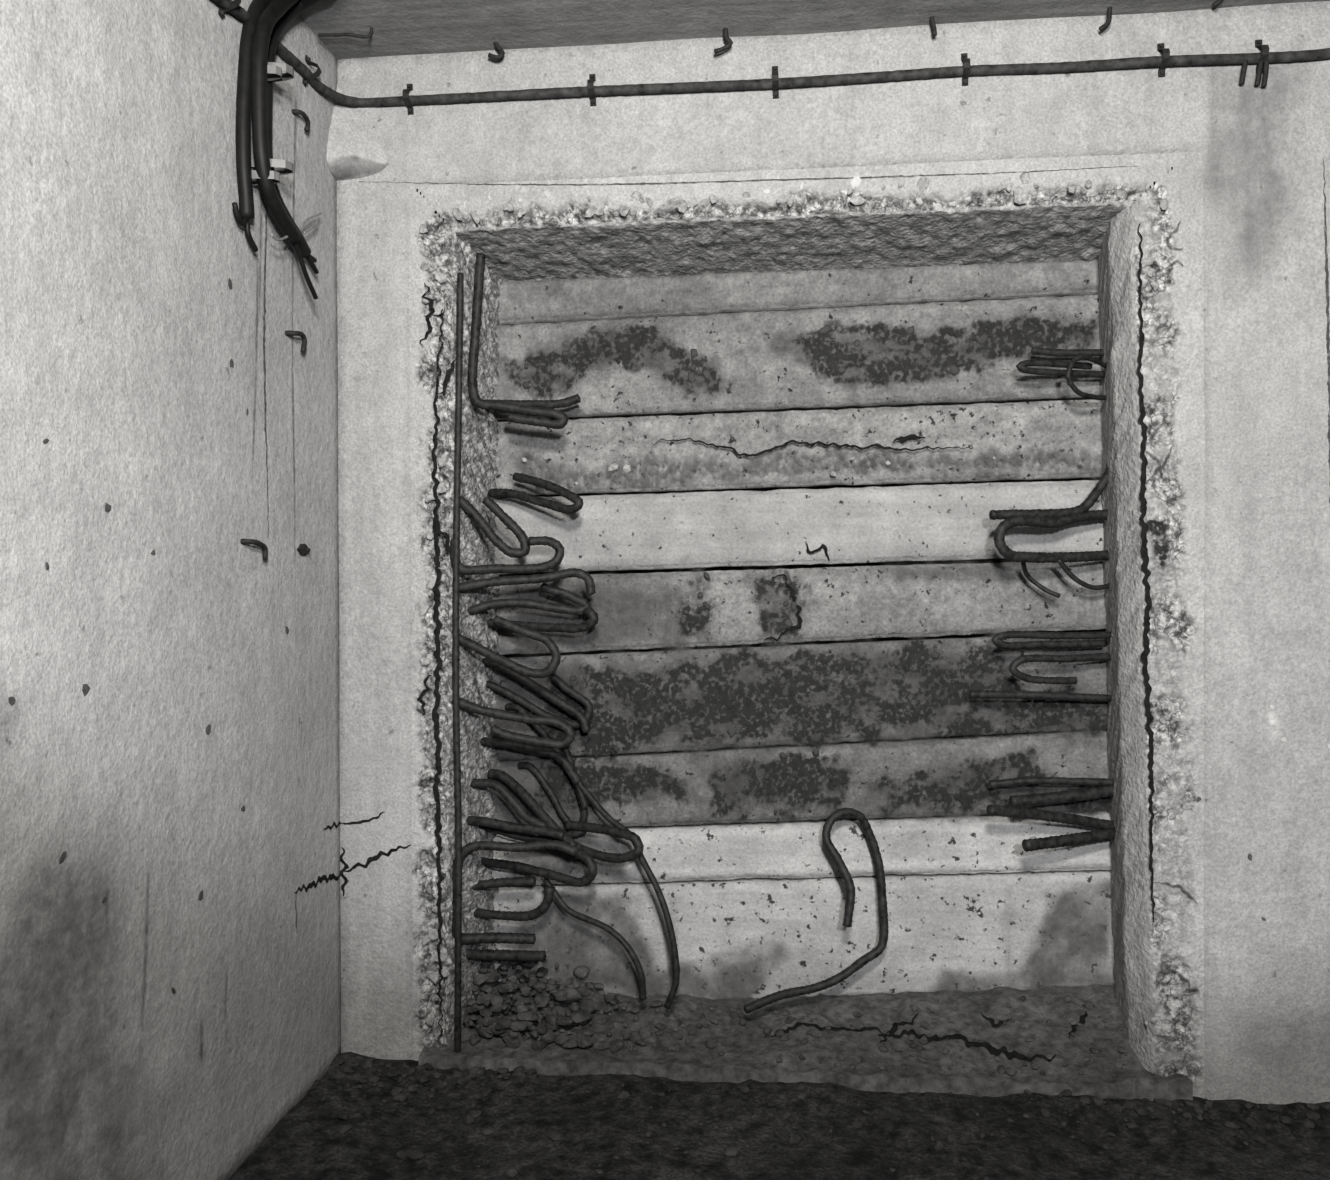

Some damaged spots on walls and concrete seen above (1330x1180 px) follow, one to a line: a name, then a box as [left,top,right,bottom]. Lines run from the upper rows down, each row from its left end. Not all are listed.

crack [651,434,973,457]
damp [517,586,645,651]
spalling [409,151,1205,1099]
crack [295,283,456,1039]
crack [765,1011,1088,1062]